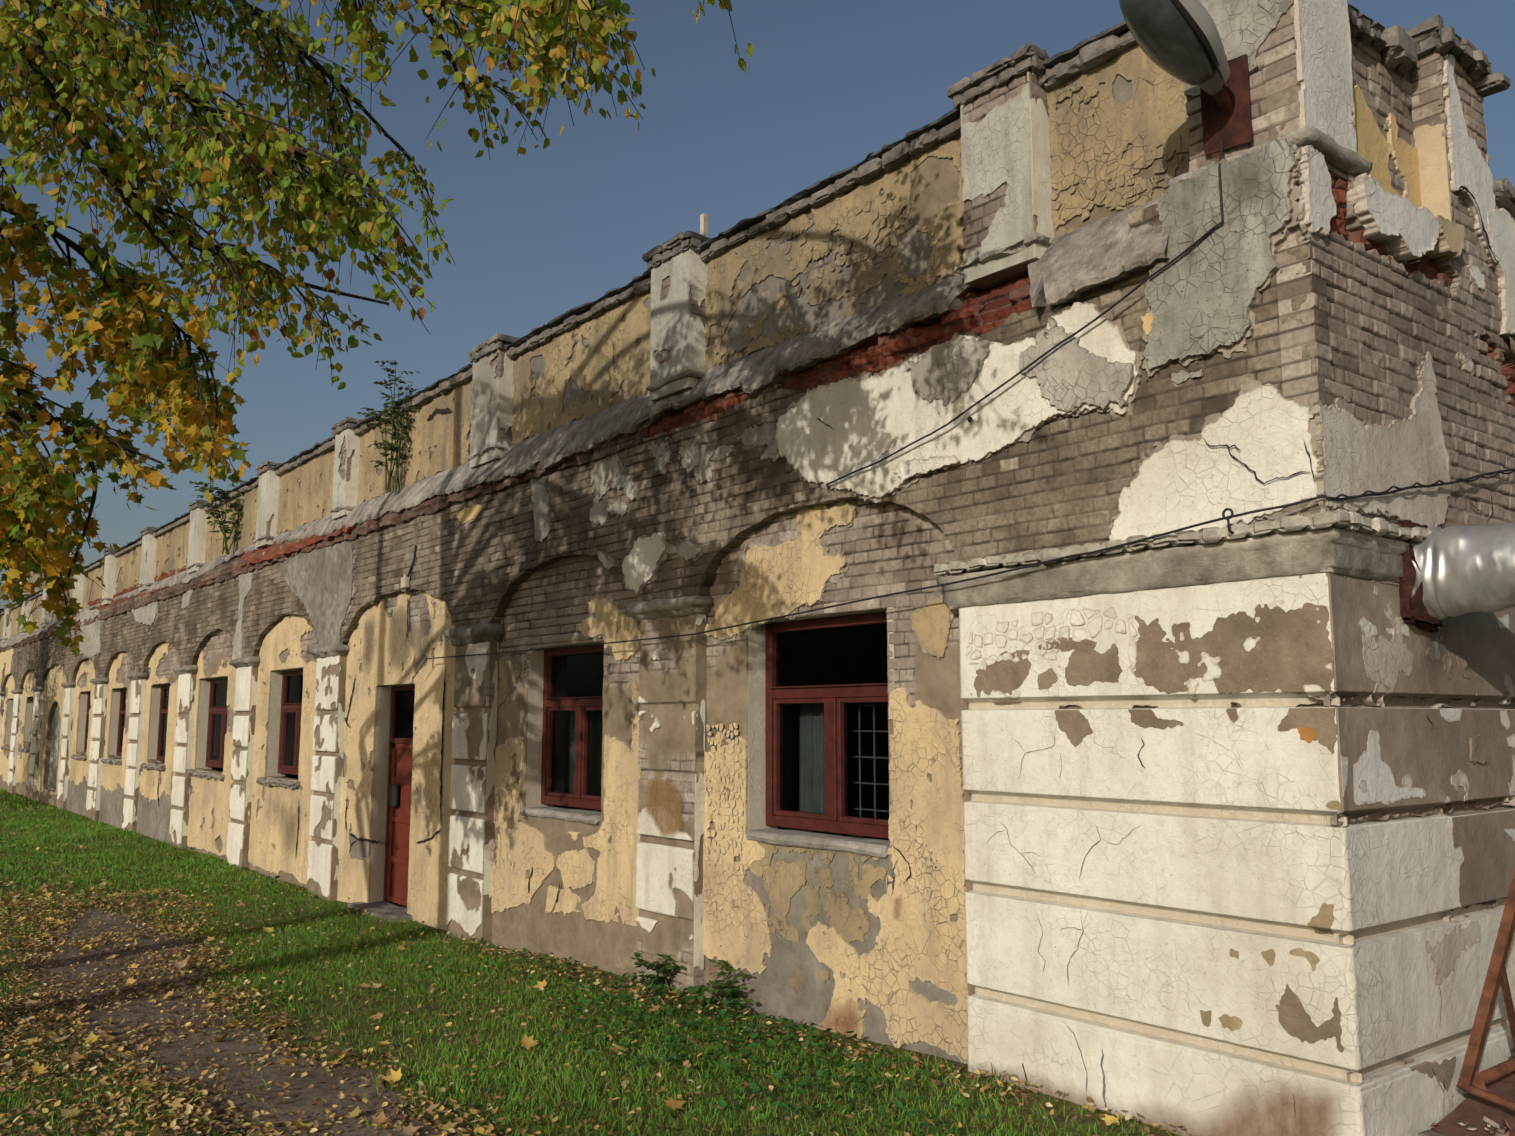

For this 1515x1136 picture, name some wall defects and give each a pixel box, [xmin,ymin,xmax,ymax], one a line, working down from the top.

flaking render [644,53,1515,645]
flaking render [589,456,637,528]
peeling [911,572,1515,985]
peeling [492,776,520,869]
flaking render [492,832,638,970]
flaking render [704,723,936,1028]
crack [987,823,1039,873]
crack [1079,826,1137,879]
flaking render [862,999,968,1065]
flaking render [910,977,958,1006]
peeling [1275,984,1344,1053]